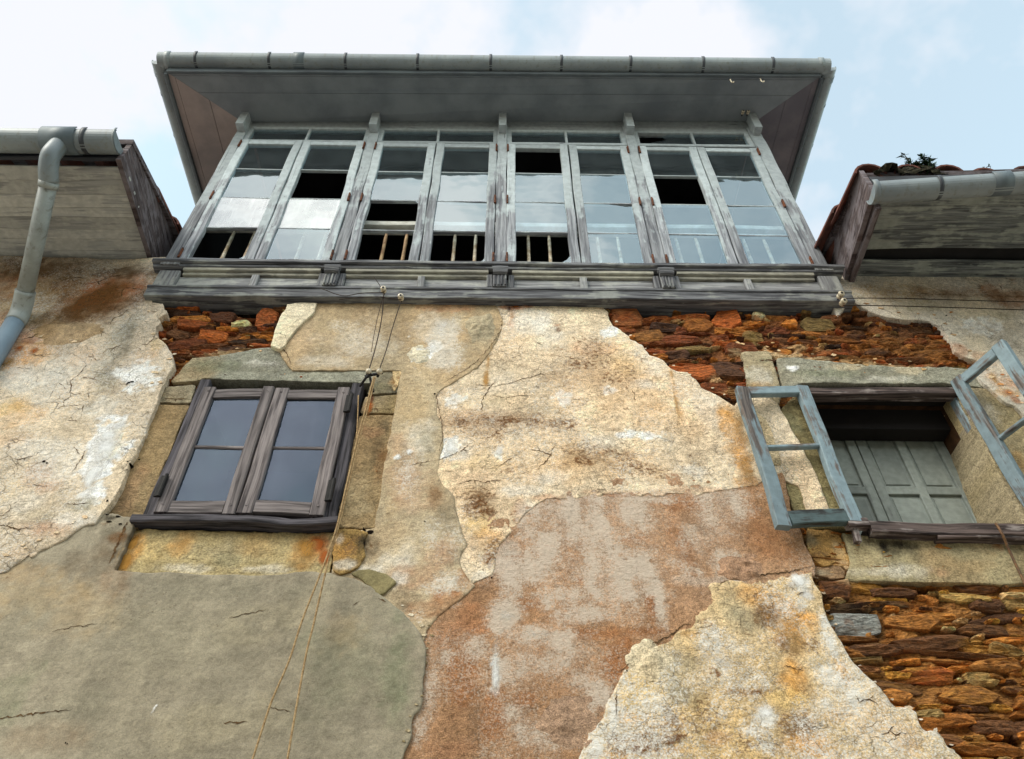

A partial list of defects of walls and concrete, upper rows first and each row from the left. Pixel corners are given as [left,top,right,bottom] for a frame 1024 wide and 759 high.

water stain [63,283,129,319]
crack [51,274,144,421]
spalling [147,302,317,389]
crack [414,316,556,466]
spalling [604,303,972,406]
crack [109,523,127,563]
spalling [799,528,1024,759]